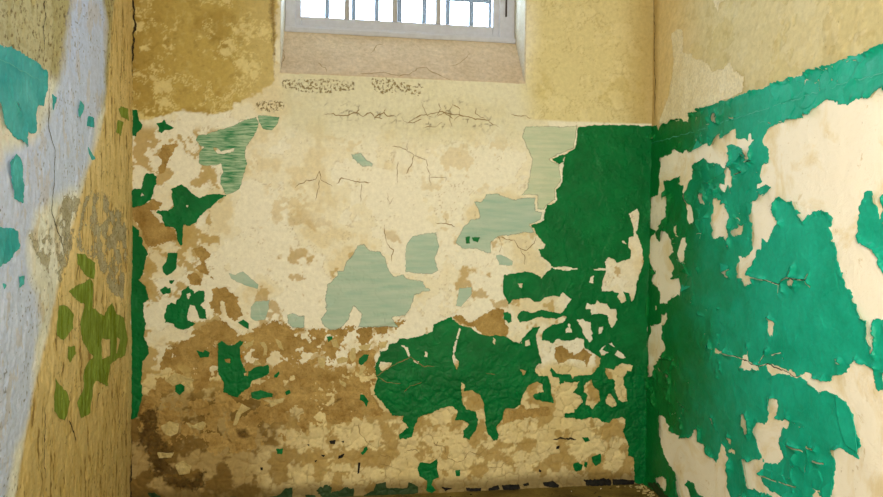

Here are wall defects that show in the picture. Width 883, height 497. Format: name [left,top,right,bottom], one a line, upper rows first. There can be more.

crack [130,0,138,75]
peeling [0,45,57,147]
damp [282,79,354,93]
damp [372,76,422,96]
crack [325,104,525,128]
crack [295,171,370,200]
crack [388,146,445,204]
peeling [0,227,21,267]
peeling [503,29,883,497]
flaking render [54,143,554,457]
damp [137,409,207,491]
peeling [352,459,452,496]